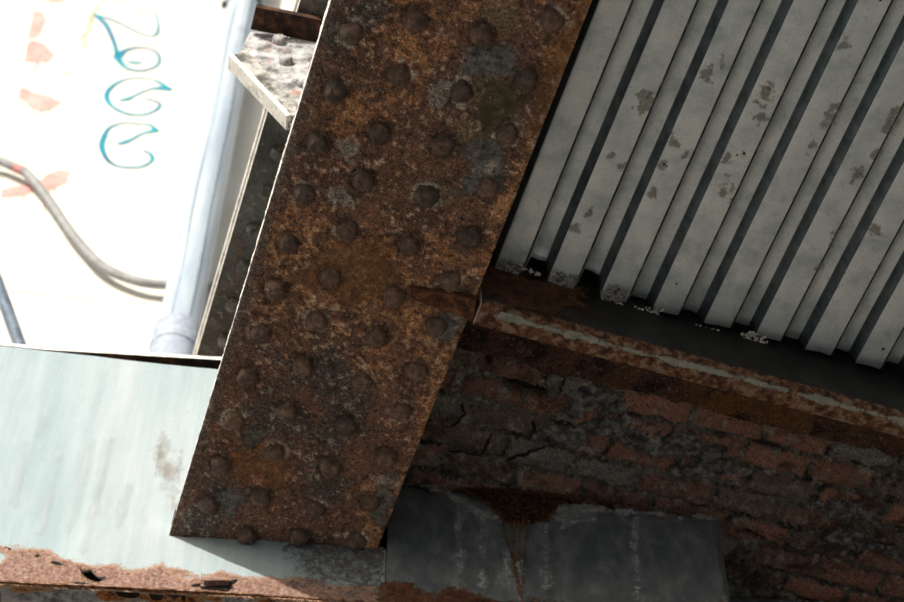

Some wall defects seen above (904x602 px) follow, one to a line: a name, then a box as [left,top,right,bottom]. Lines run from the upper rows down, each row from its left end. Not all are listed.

crack [449,403,467,427]
crack [448,420,546,462]
rust [457,258,904,457]
rust [0,486,589,602]